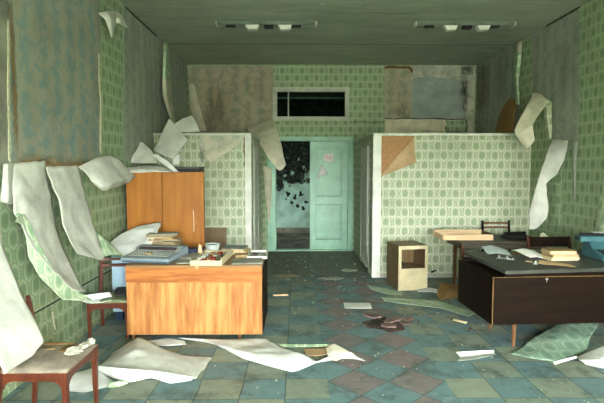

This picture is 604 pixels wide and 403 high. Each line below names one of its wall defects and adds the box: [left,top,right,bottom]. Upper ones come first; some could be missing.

flaking render [0,0,11,169]
flaking render [411,65,475,133]